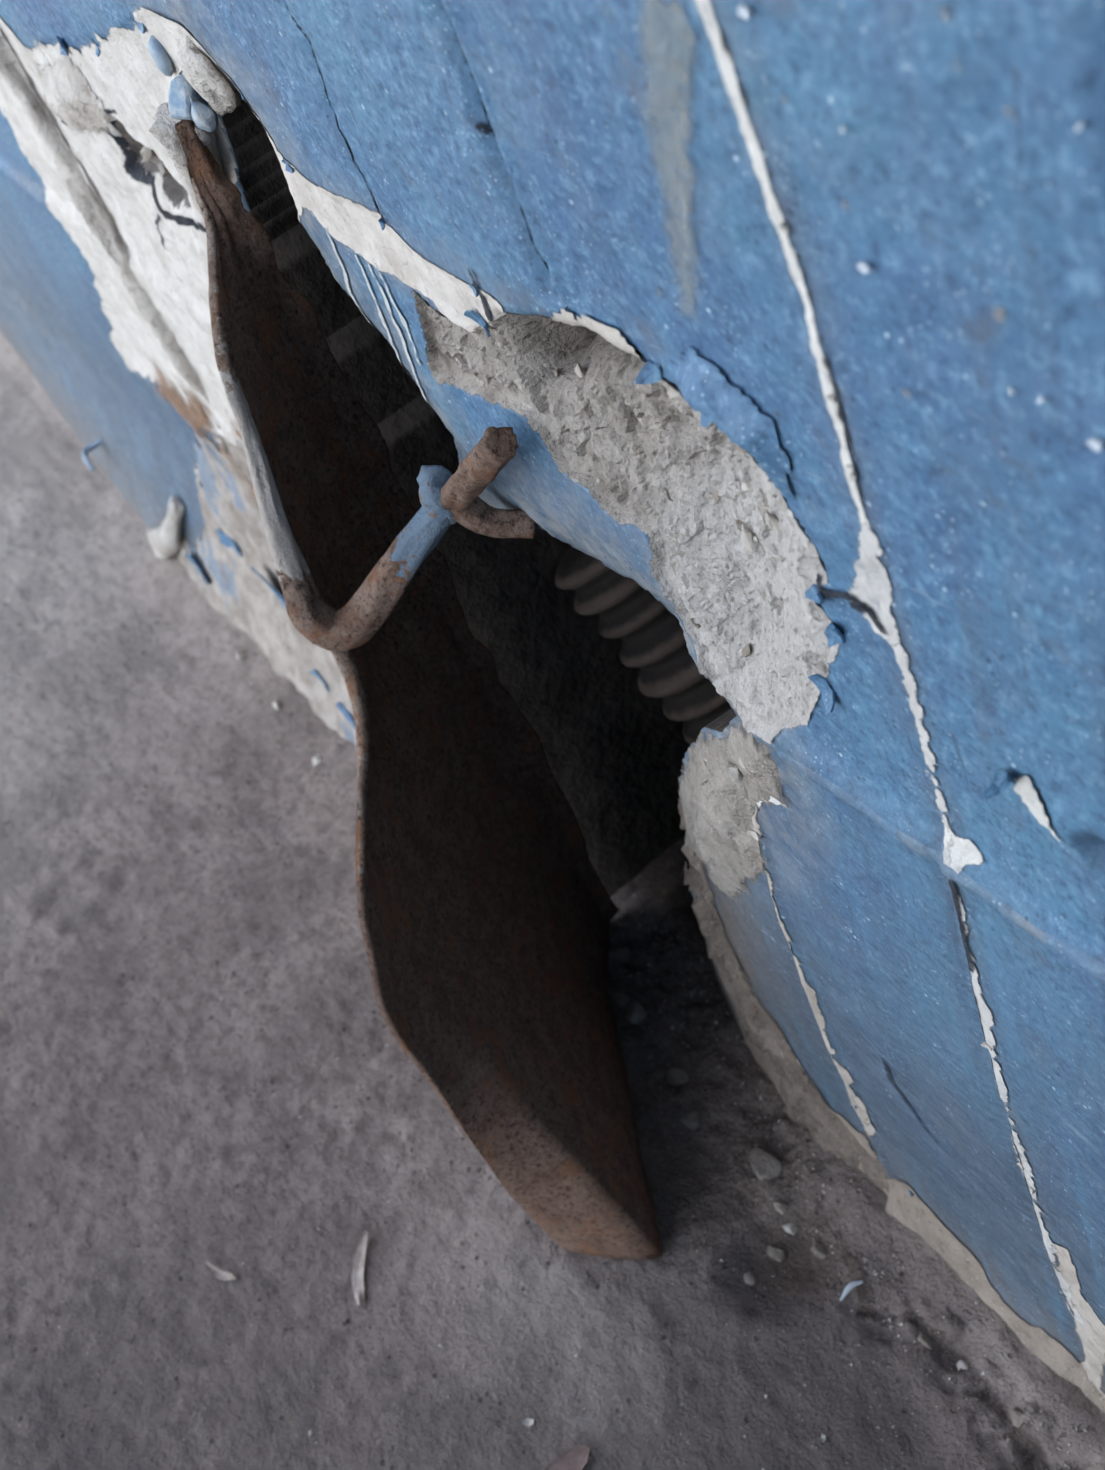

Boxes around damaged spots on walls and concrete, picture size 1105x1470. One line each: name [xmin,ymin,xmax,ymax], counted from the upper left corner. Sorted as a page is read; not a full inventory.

corrosion [155,368,231,464]
spalling [0,7,845,749]
corrosion [331,650,369,874]
crack [816,574,886,635]
peeling [678,0,1105,1413]
crack [948,879,974,972]